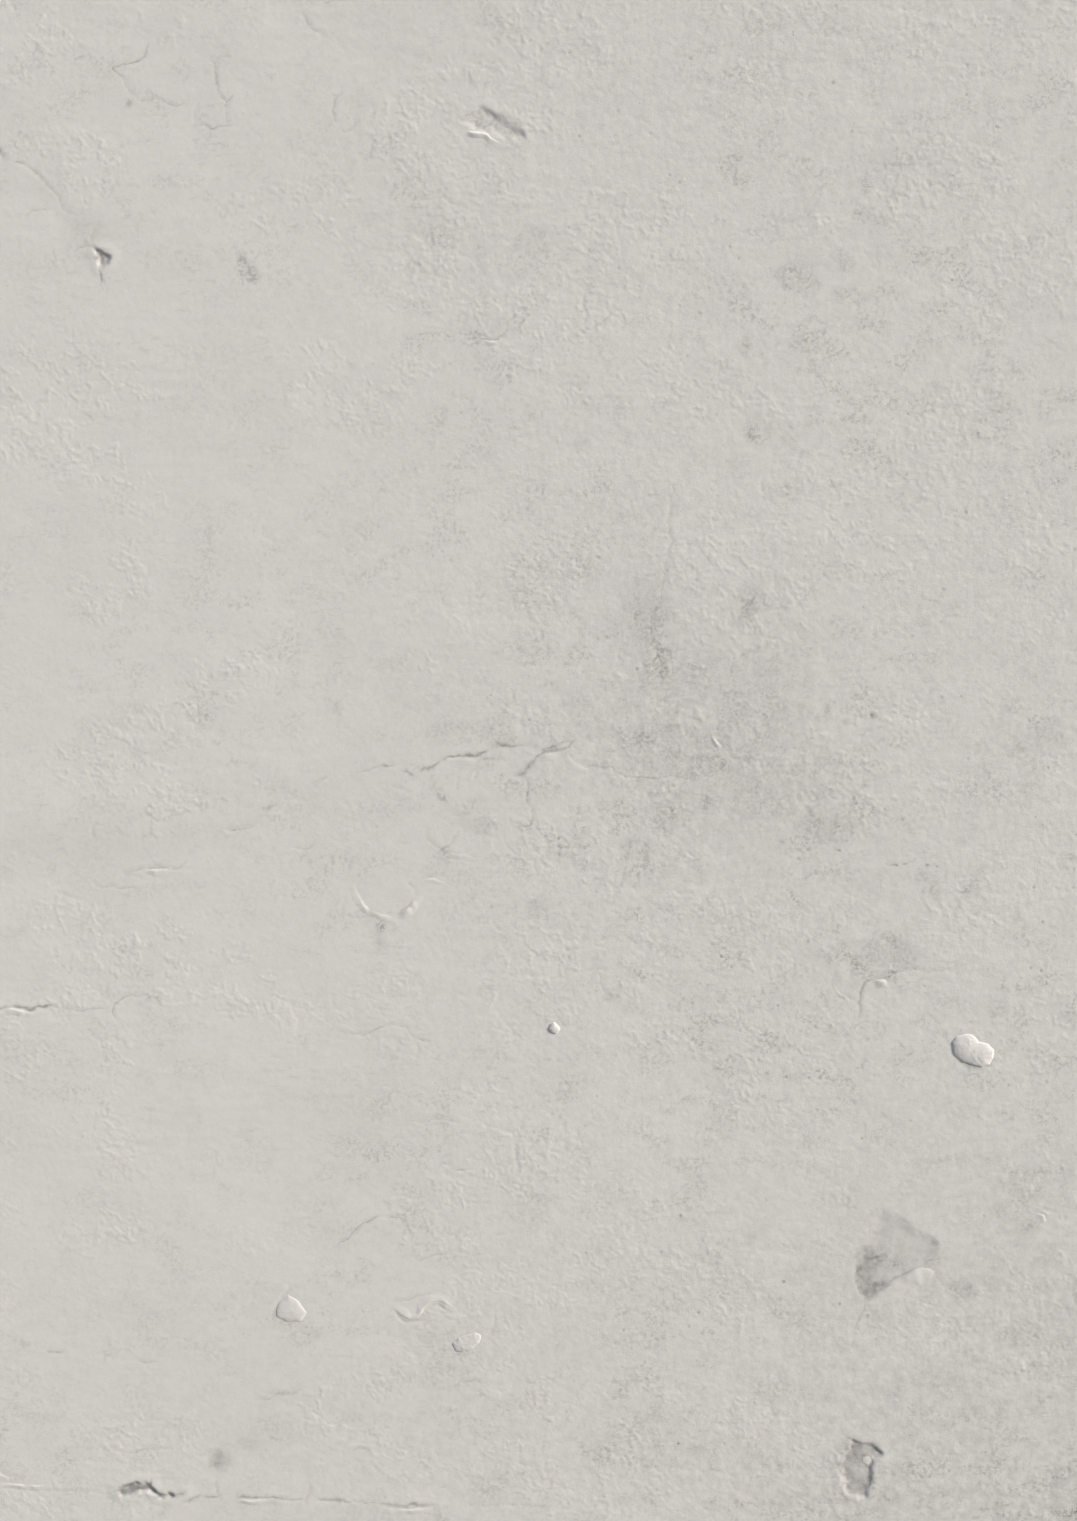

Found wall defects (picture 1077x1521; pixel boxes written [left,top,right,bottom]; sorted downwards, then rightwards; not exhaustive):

crack [538,752,593,773]
spalling [872,1268,935,1304]